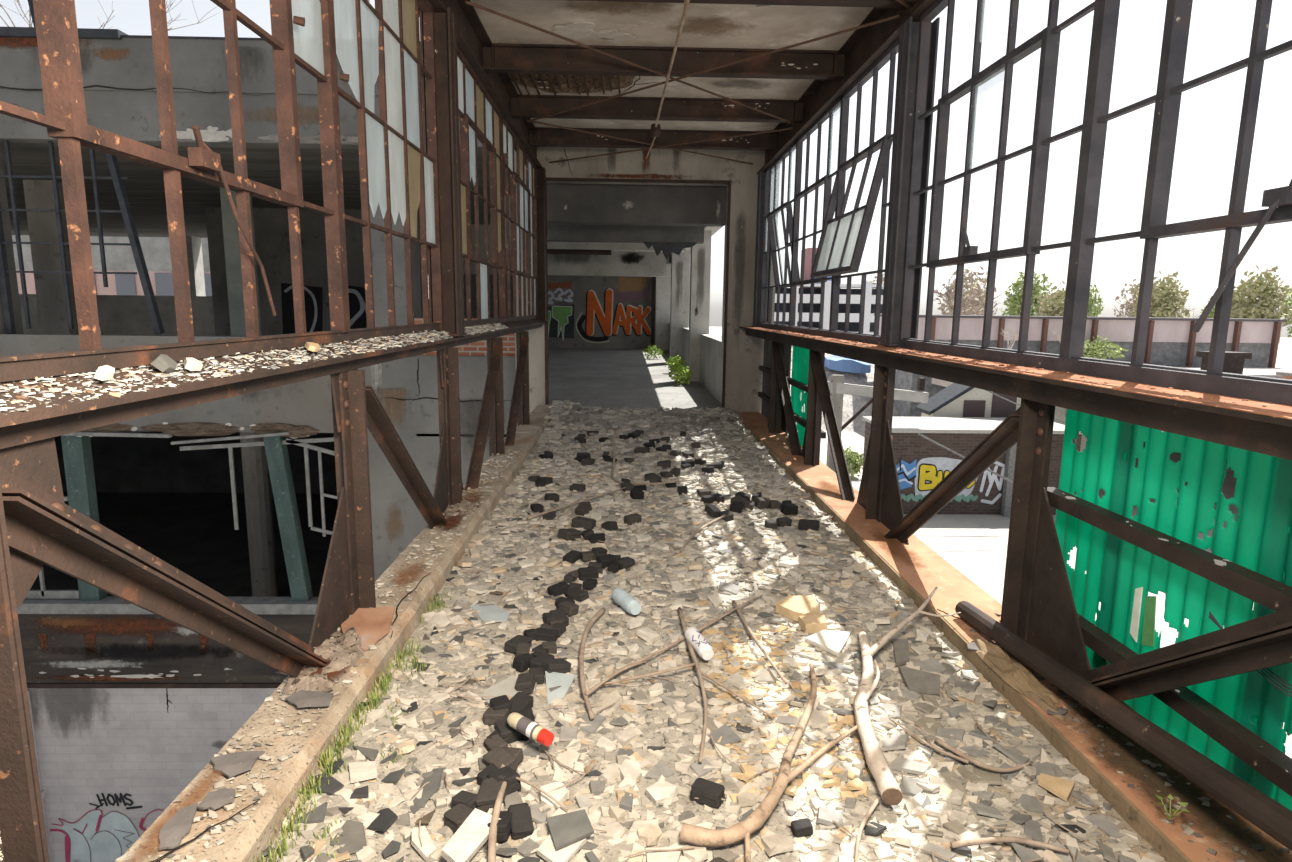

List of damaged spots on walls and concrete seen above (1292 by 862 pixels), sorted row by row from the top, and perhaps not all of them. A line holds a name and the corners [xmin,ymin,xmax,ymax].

water stain [569,1,663,11]
water stain [673,19,737,33]
corrosion [0,37,38,48]
corrosion [38,618,184,653]